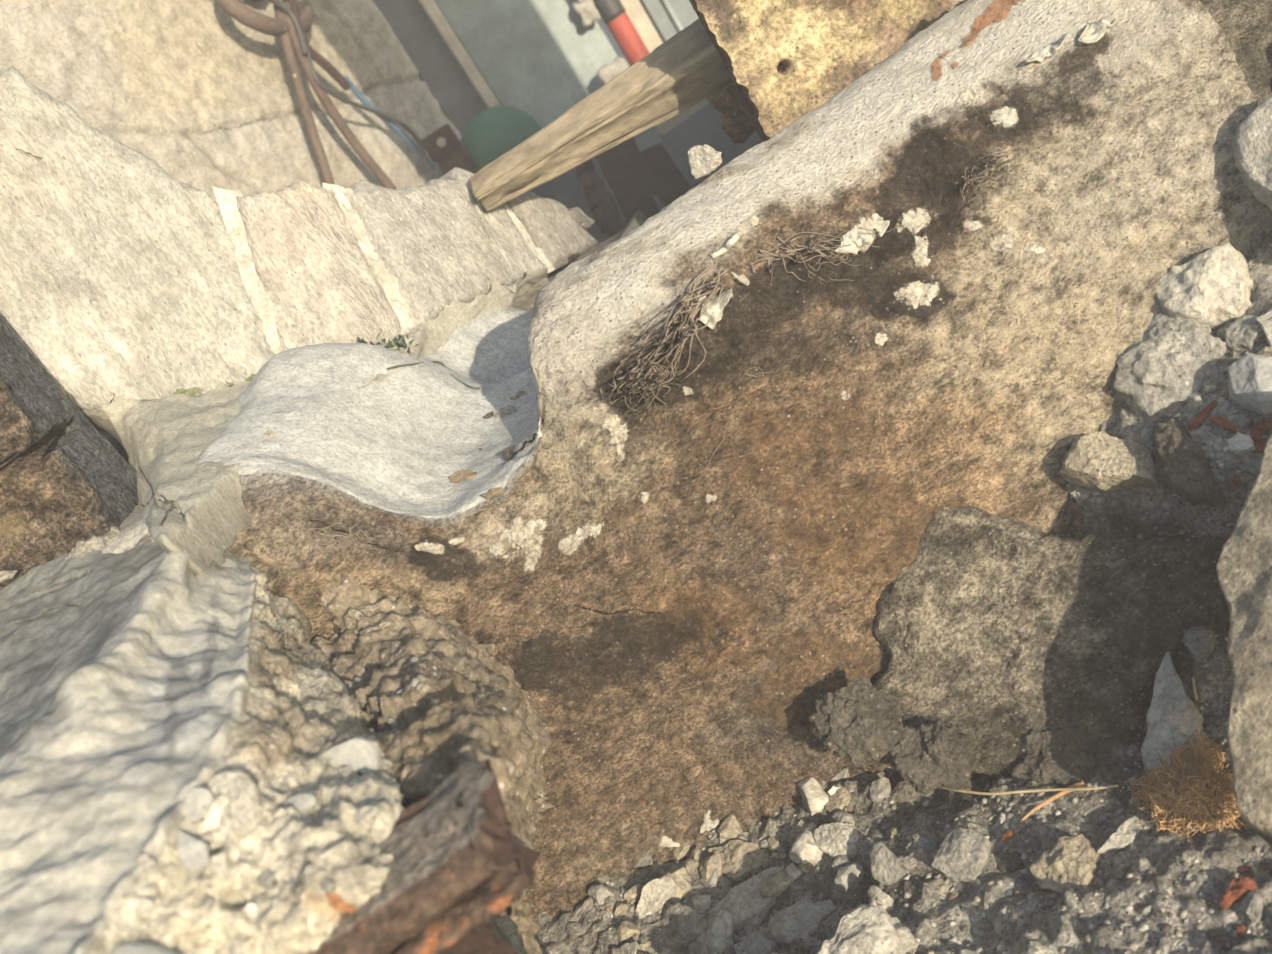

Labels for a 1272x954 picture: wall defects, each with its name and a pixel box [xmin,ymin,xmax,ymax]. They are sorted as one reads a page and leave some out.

corrosion [931,0,1025,81]
damp [1043,33,1113,83]
damp [591,83,1094,416]
damp [699,399,937,579]
damp [406,535,486,582]
damp [496,584,757,701]
damp [750,633,886,728]
corrosion [326,892,357,913]